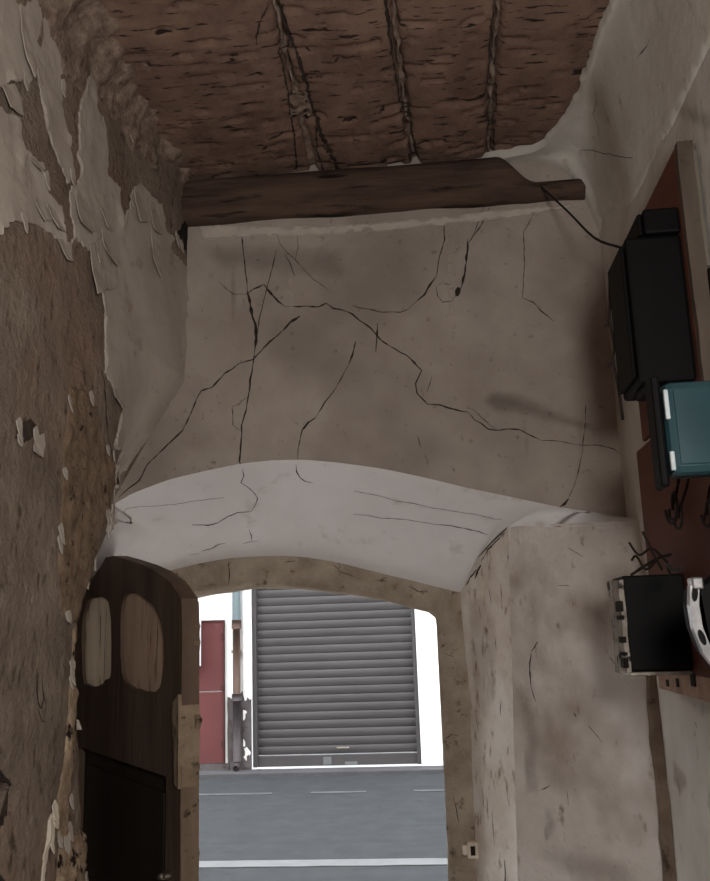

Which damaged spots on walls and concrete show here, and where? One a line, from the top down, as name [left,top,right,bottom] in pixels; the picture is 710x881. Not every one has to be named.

peeling [0,0,189,881]
crack [119,207,619,579]
crack [355,491,505,617]